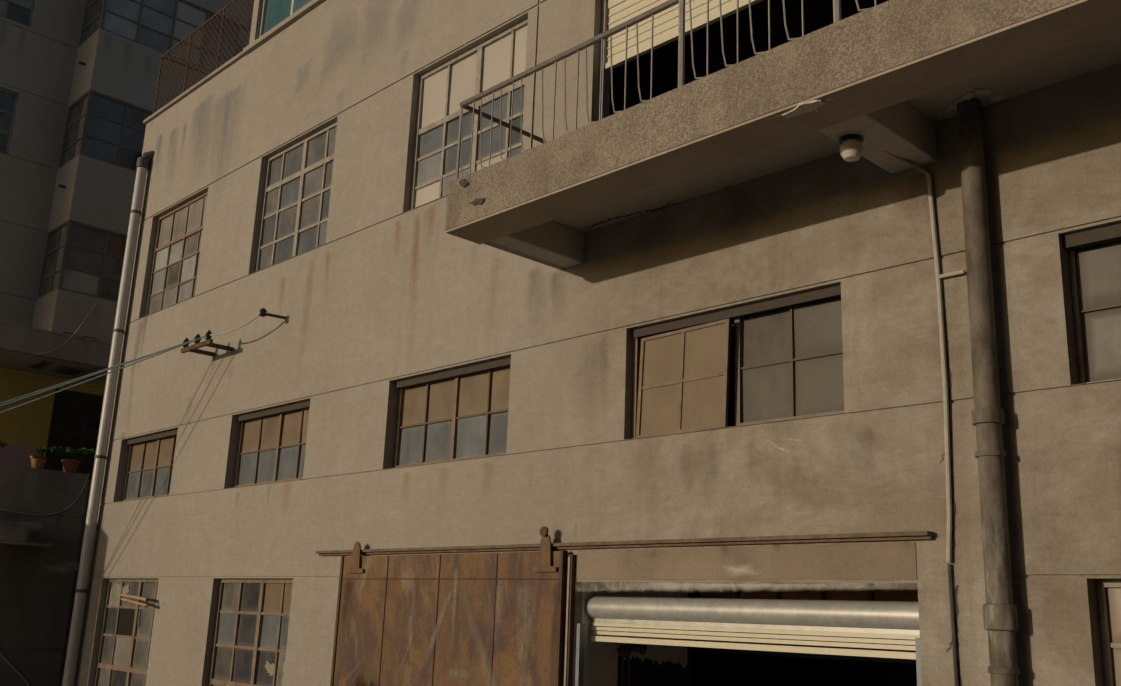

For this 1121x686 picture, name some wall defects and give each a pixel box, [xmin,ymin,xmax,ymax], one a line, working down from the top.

crack [586,199,691,229]